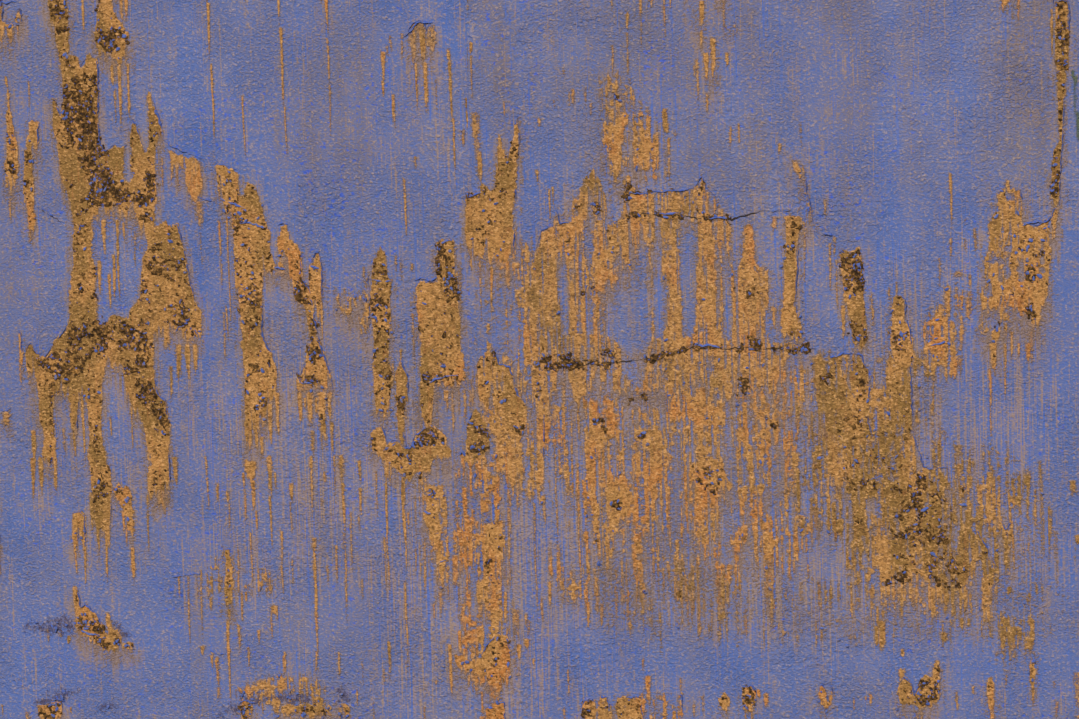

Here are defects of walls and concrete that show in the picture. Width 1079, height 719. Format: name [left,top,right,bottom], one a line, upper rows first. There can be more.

crack [613,210,788,225]
peeling [948,172,977,251]
peeling [920,238,972,385]
crack [542,343,784,368]